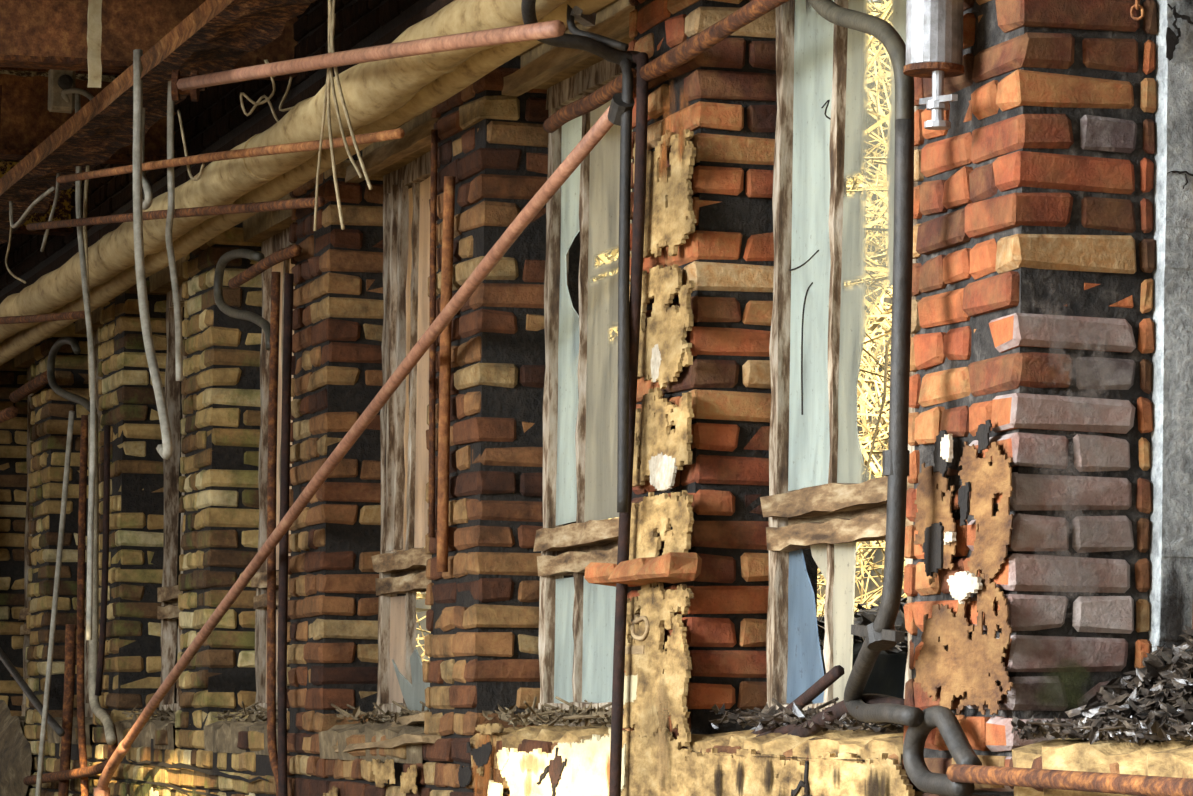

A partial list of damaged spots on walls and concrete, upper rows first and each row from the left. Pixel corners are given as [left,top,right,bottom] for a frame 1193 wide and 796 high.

crack [1167,4,1193,38]
peeling [629,129,696,560]
peeling [914,419,1013,715]
peeling [371,759,417,794]